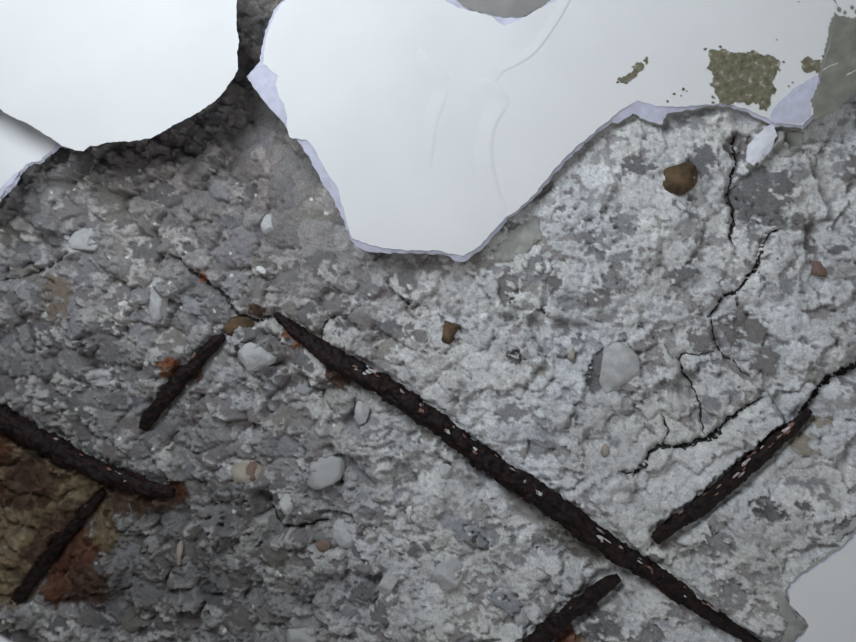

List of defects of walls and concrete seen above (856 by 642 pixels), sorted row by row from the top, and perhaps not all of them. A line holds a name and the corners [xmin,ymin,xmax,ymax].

peeling [457,0,551,18]
peeling [769,12,856,124]
peeling [0,109,67,202]
crack [726,132,737,244]
spalling [746,124,777,166]
corrosion [156,358,181,378]
corrosion [248,303,268,318]
corrosion [325,367,351,391]
crack [618,228,780,474]
crack [796,361,856,417]
corrosion [0,433,189,610]
spalling [274,312,761,642]